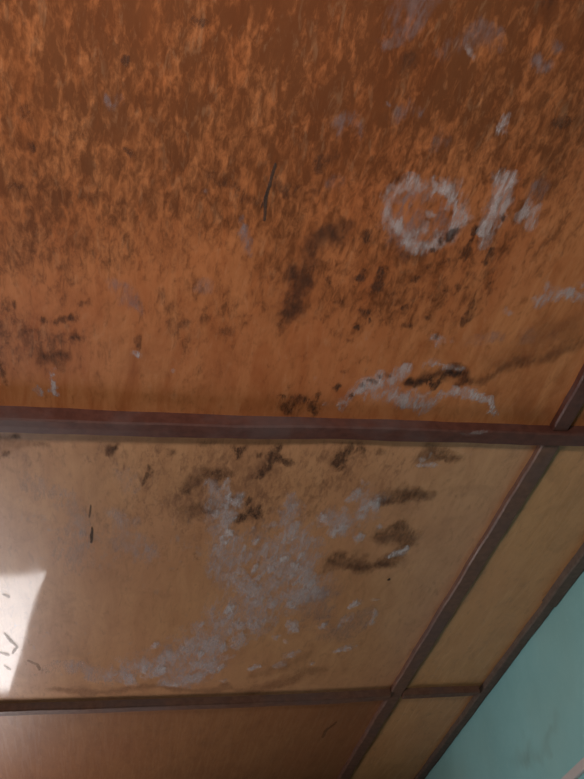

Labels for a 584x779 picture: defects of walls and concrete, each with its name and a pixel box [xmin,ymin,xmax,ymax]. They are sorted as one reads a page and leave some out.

leakage [349,363,468,409]
leakage [121,482,318,686]